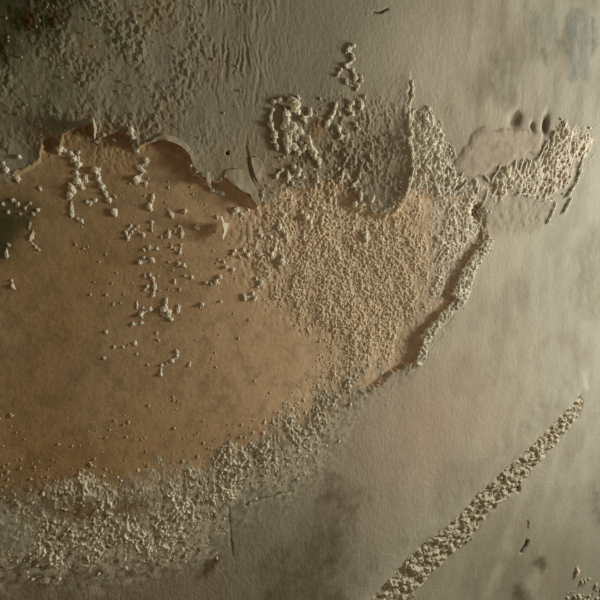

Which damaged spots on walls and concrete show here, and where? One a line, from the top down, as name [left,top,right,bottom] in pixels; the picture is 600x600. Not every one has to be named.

leakage [0,197,41,260]
leakage [55,146,121,228]
leakage [124,126,156,244]
leakage [127,201,202,327]
spalling [0,118,487,497]